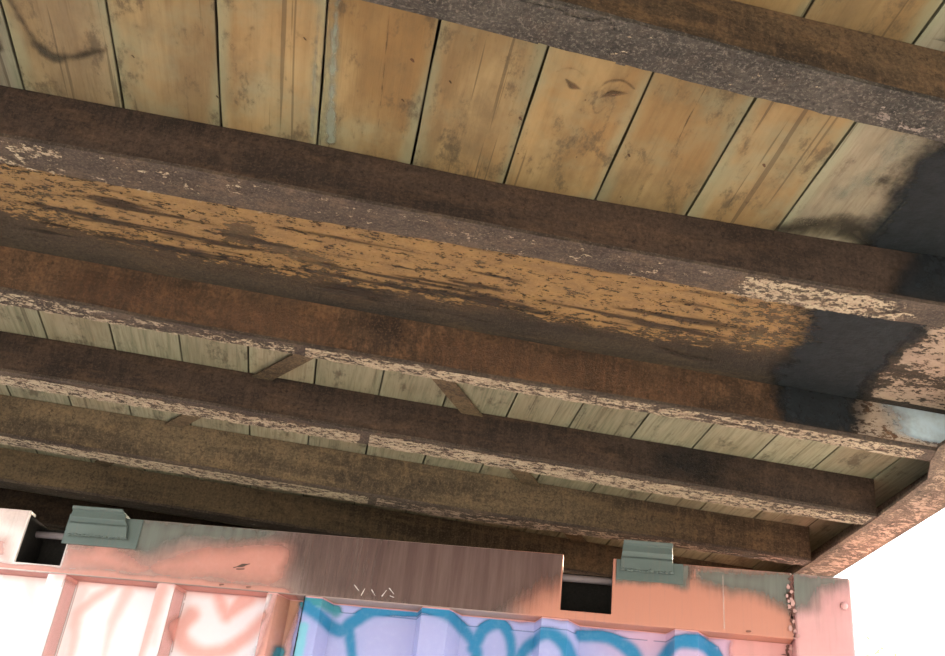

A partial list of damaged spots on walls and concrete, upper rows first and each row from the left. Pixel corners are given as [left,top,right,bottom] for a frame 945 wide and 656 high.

peeling [0,141,916,354]
peeling [0,293,945,576]
crack [782,576,796,656]